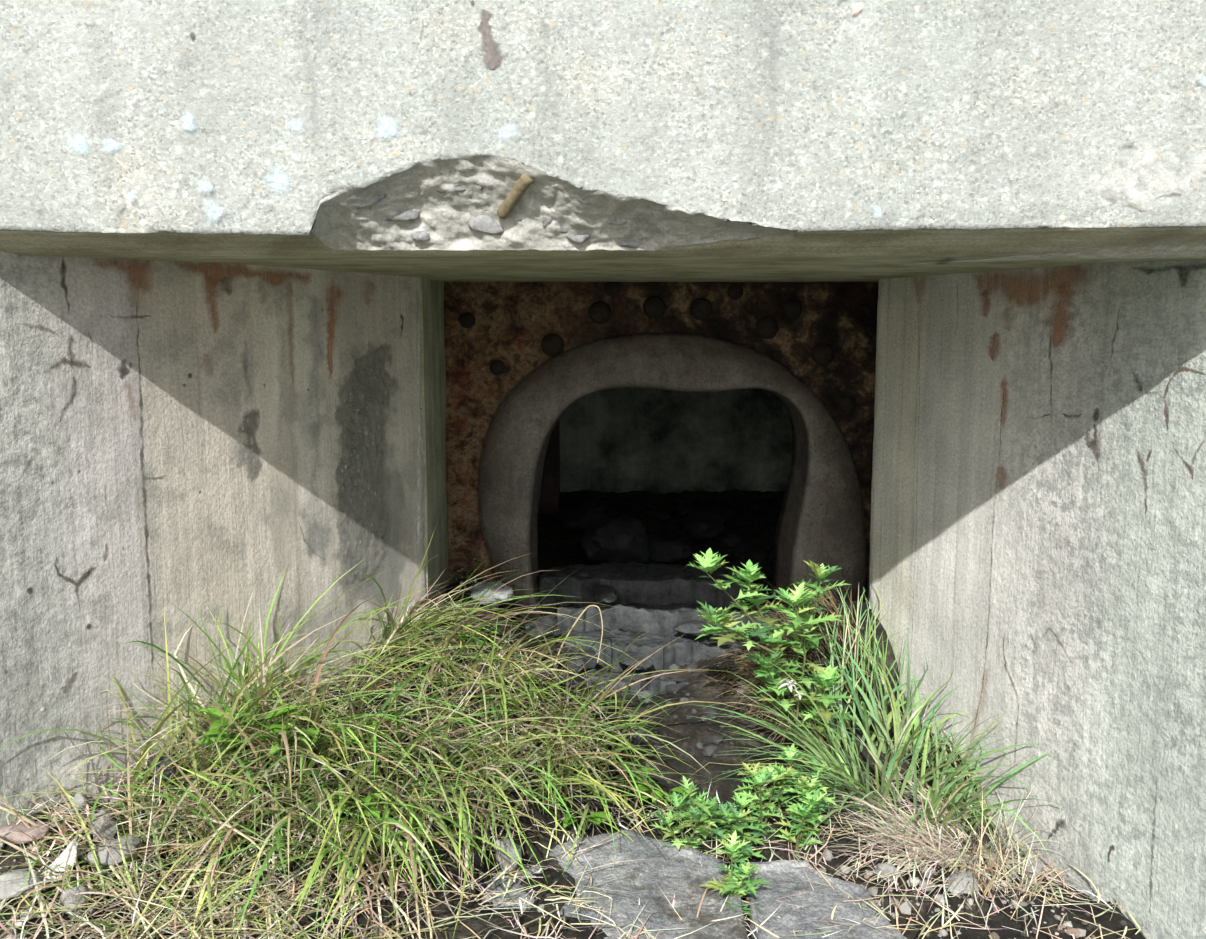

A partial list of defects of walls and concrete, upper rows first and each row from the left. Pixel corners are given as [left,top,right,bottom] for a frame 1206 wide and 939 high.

corrosion [180,262,309,332]
corrosion [328,286,340,375]
corrosion [978,267,1079,372]
crack [46,260,166,663]
crack [1145,367,1206,480]